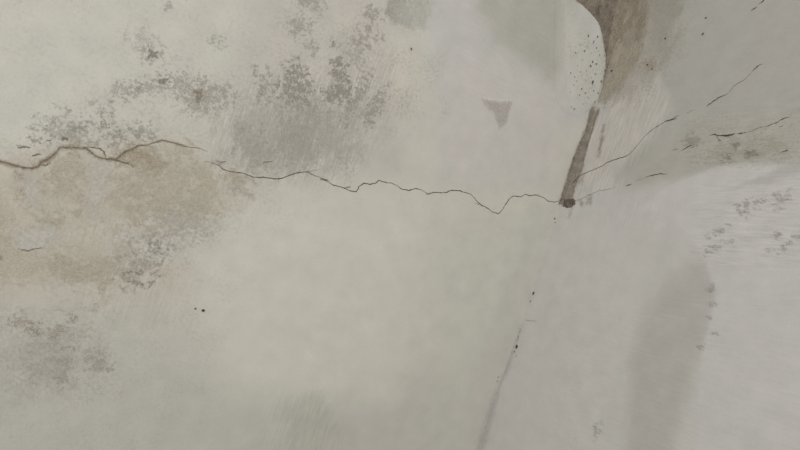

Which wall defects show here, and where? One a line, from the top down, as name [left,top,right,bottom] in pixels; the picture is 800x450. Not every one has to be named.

damp [0,0,394,414]
crack [0,65,759,214]
crack [710,117,788,141]